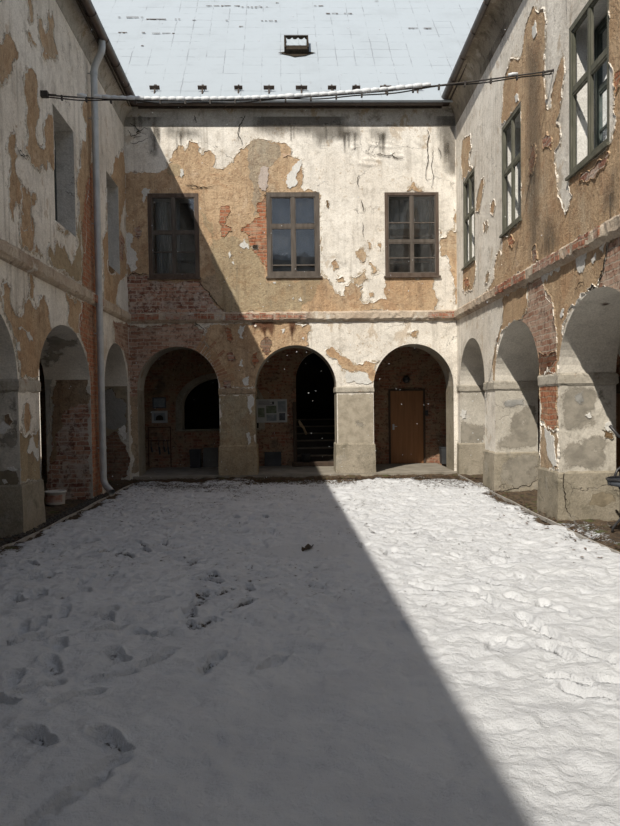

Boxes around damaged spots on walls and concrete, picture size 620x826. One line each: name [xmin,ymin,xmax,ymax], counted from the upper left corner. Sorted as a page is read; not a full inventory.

leakage [259,117,351,145]
leakage [443,116,455,169]
peeling [0,0,620,500]
leakage [561,386,602,430]
leakage [563,436,606,469]